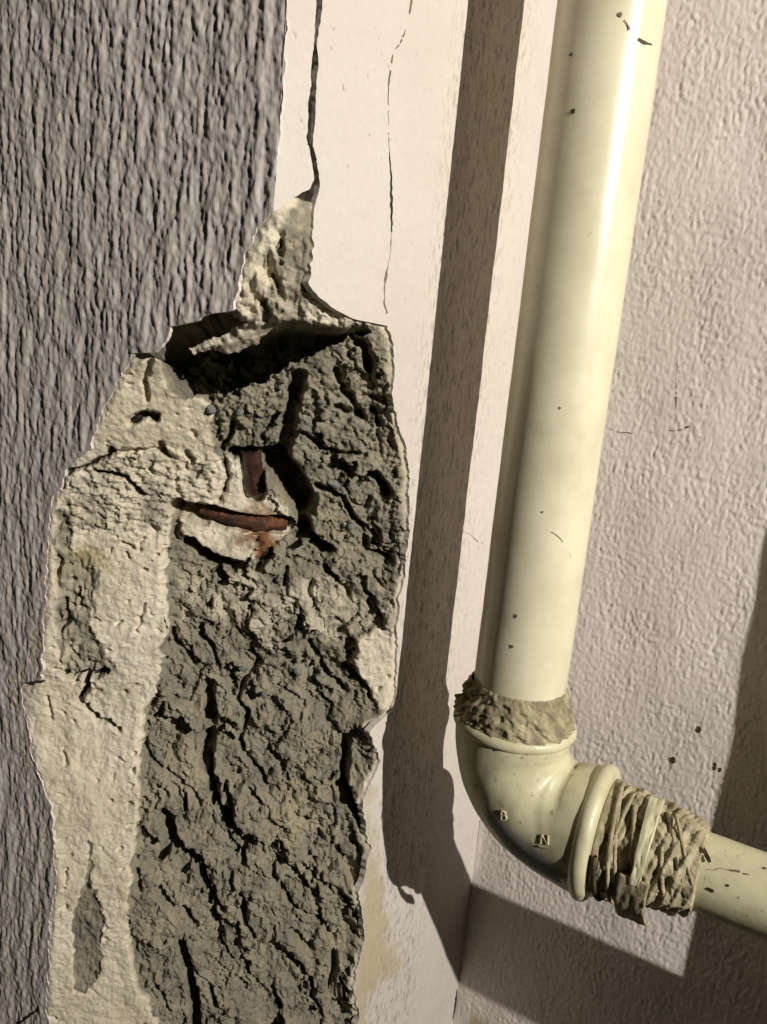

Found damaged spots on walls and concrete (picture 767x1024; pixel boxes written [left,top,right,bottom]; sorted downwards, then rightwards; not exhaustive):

crack [295,55,315,202]
crack [384,0,413,314]
spalling [9,194,408,1024]
rust [244,528,273,558]